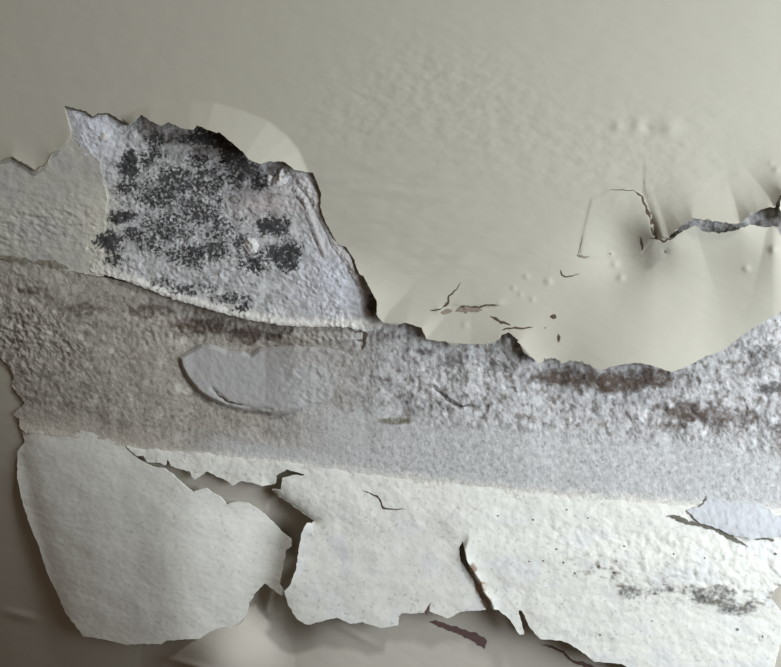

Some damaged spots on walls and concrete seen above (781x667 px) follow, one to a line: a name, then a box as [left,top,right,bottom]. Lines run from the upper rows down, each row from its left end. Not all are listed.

spalling [0,132,108,276]
leakage [91,124,304,276]
spalling [65,91,384,331]
peeling [580,164,781,258]
leakage [148,277,252,313]
leakage [172,319,282,345]
leakage [367,295,377,316]
crack [430,283,560,342]
leakage [536,366,681,393]
flaking render [0,210,781,667]
leakage [663,401,732,427]
crack [365,491,400,510]